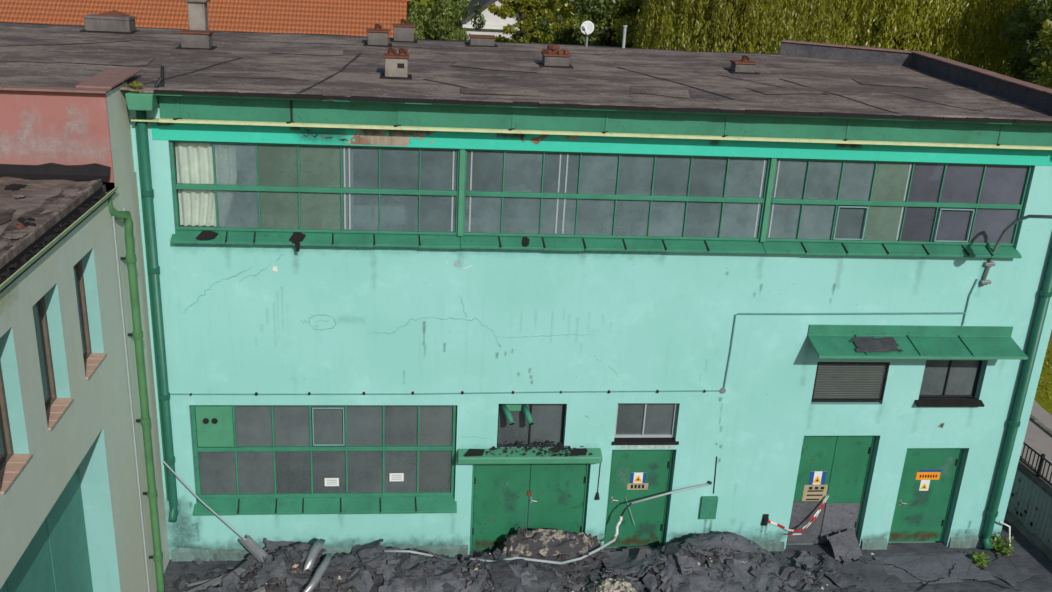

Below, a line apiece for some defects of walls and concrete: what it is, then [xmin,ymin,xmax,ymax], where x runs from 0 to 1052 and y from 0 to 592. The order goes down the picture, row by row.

peeling [346,128,438,146]
peeling [521,134,549,144]
crack [181,255,281,314]
crack [369,295,616,373]
crack [885,563,1020,592]